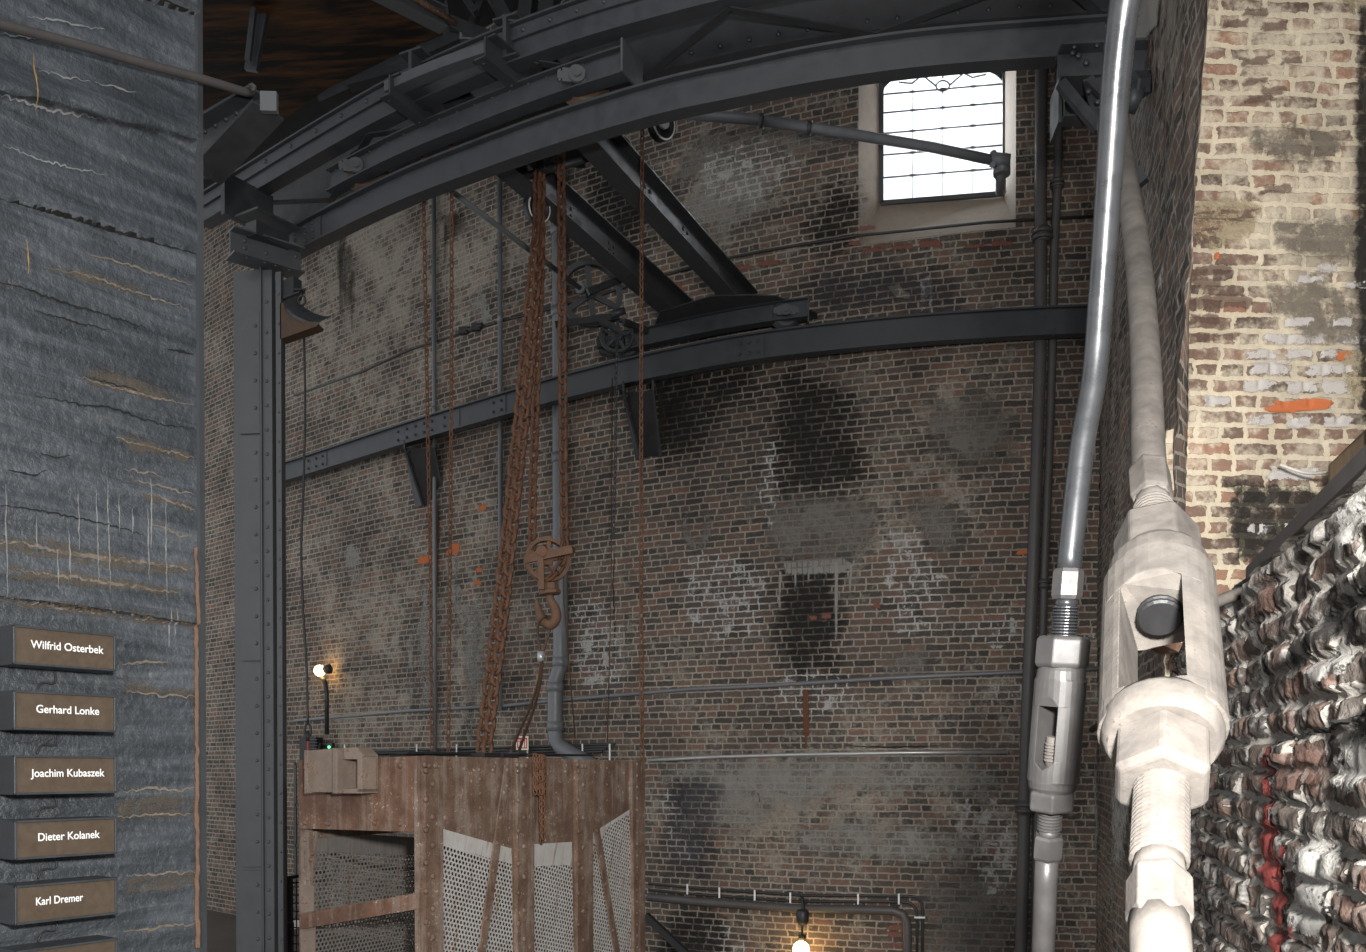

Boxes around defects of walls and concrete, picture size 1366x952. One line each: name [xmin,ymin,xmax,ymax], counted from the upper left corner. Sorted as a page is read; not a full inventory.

crack [0,282,193,354]
water stain [1204,316,1365,407]
crack [36,376,194,429]
spalling [1265,398,1334,413]
water stain [1246,413,1353,429]
water stain [759,442,781,524]
water stain [1247,523,1288,535]
water stain [1326,489,1366,566]
water stain [683,550,856,640]
water stain [1305,637,1363,689]
water stain [1333,737,1366,793]
water stain [1265,750,1342,945]